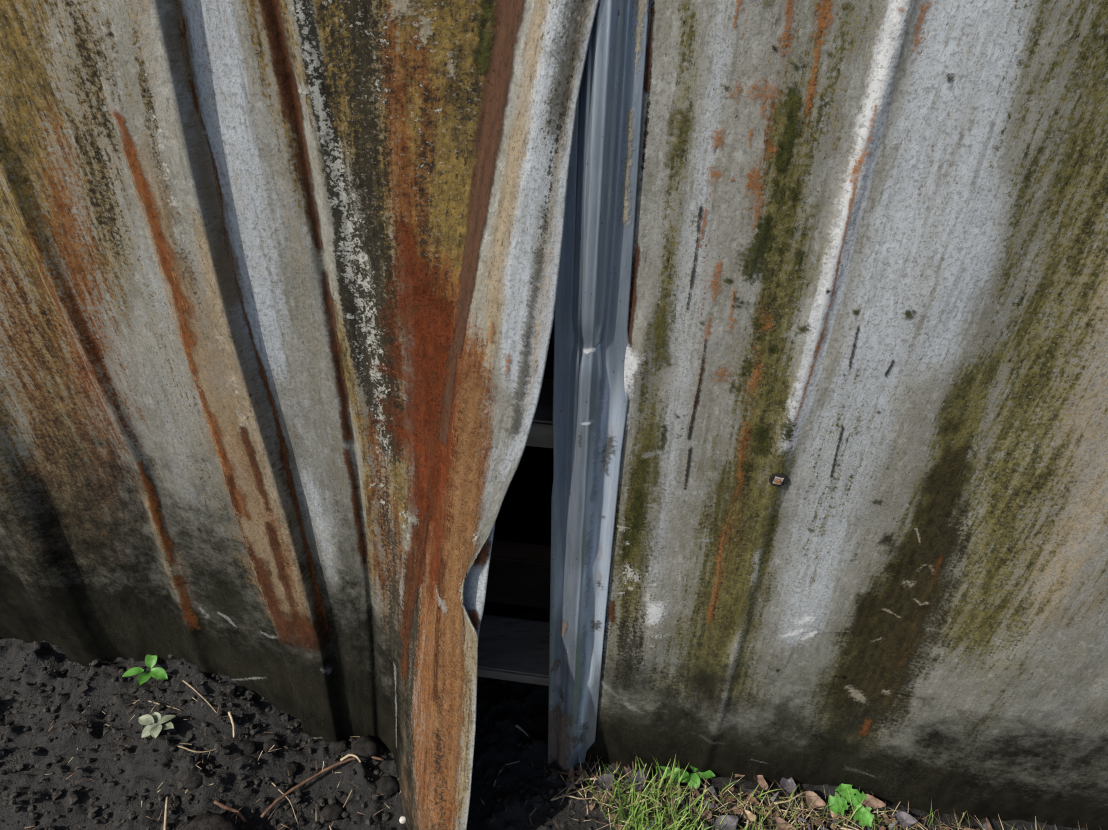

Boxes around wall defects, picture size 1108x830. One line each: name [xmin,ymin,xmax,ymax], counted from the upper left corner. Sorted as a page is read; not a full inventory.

rust [805,0,833,113]
rust [113,0,333,652]
rust [321,270,366,566]
rust [379,0,525,798]
rust [794,105,877,421]
damp [87,599,380,716]
damp [596,672,911,795]